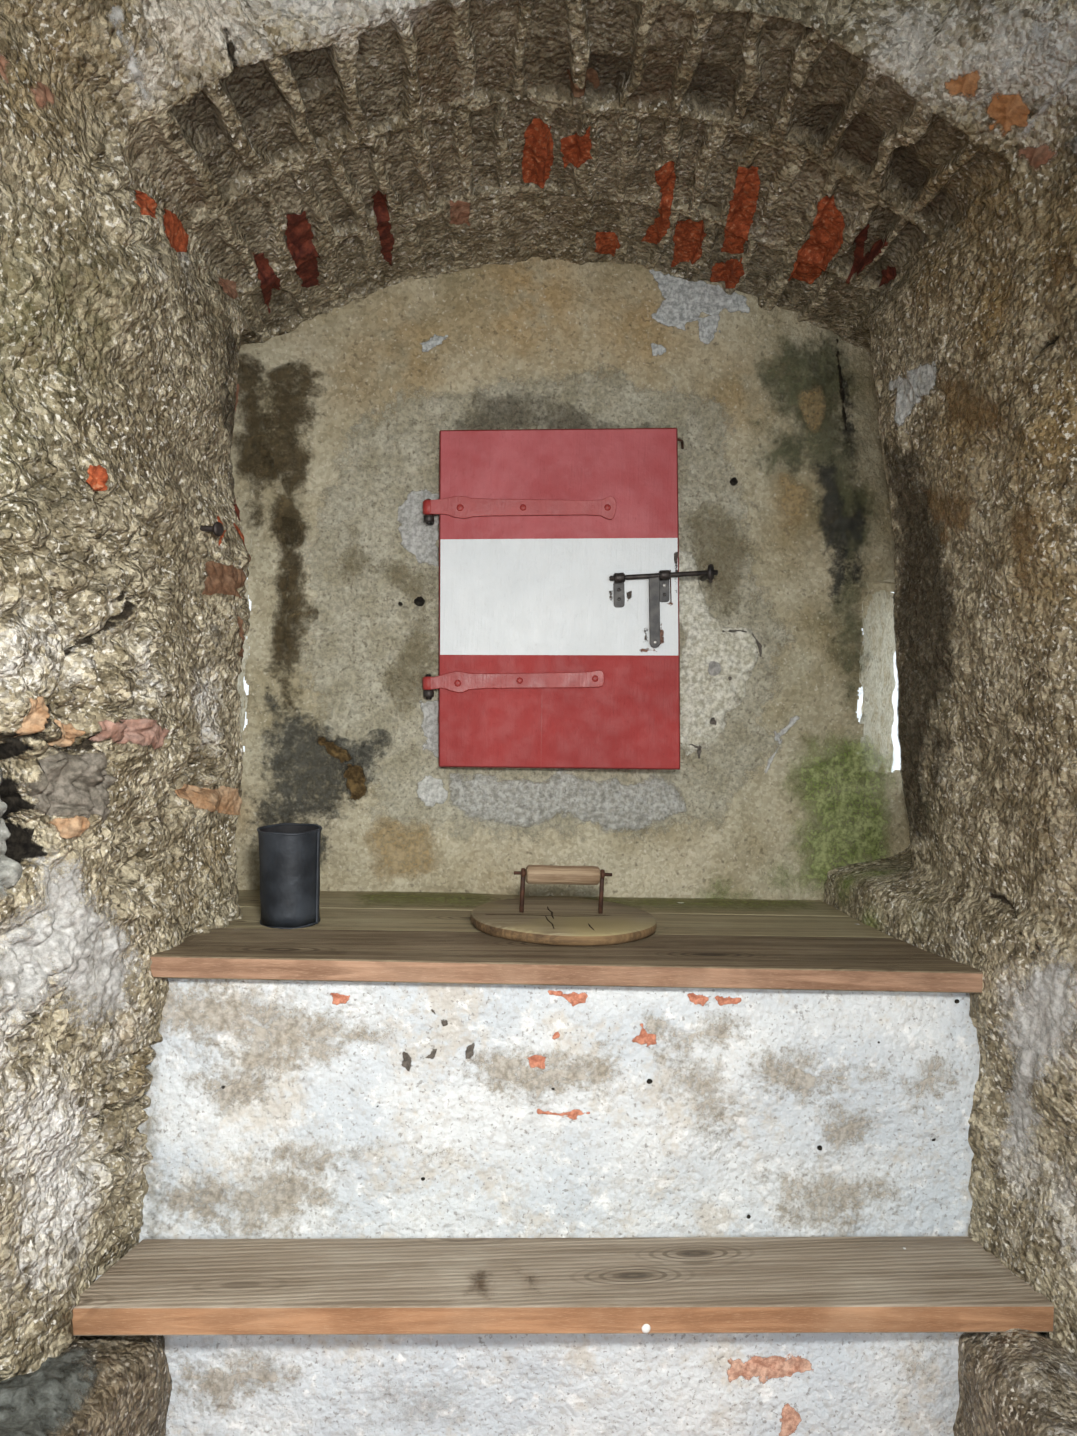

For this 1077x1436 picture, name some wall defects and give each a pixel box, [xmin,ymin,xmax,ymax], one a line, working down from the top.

flaking render [522,118,592,188]
flaking render [134,190,189,252]
flaking render [253,253,281,313]
flaking render [285,211,320,288]
flaking render [371,190,395,266]
flaking render [594,231,621,256]
flaking render [641,161,760,344]
flaking render [788,195,897,287]
leakage [817,464,865,596]
leakage [222,329,388,826]
flaking render [727,1354,812,1384]
flaking render [779,1403,801,1436]